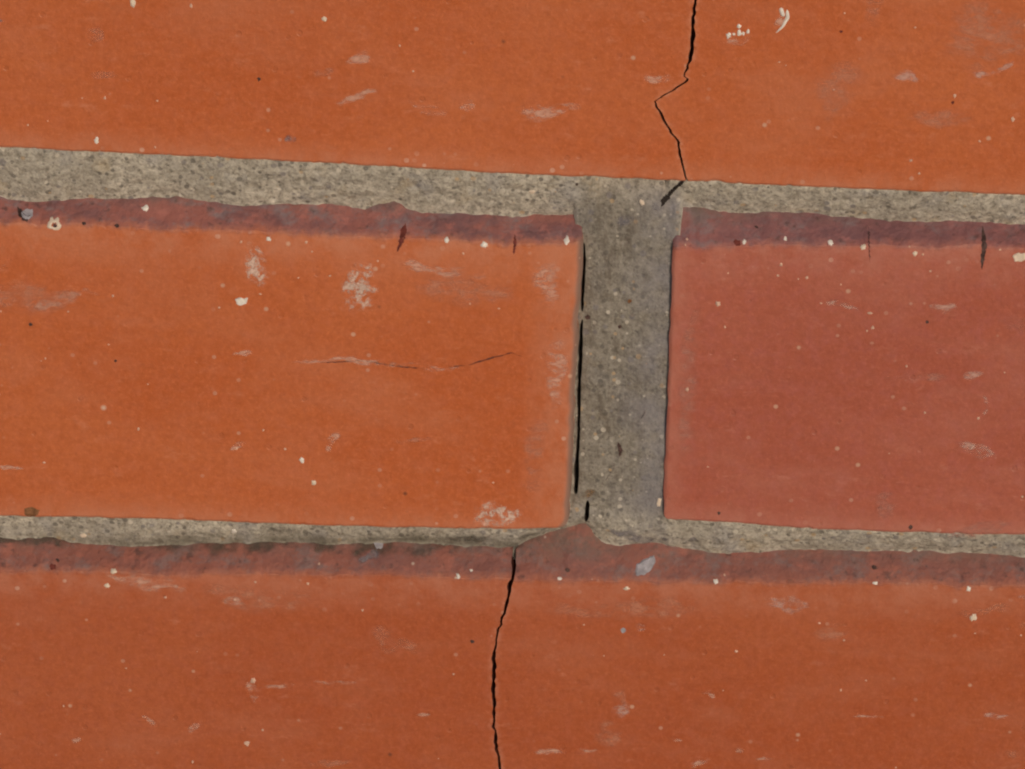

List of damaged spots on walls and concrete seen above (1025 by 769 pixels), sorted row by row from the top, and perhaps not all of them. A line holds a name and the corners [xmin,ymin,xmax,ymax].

crack [654,0,697,207]
crack [491,546,518,769]